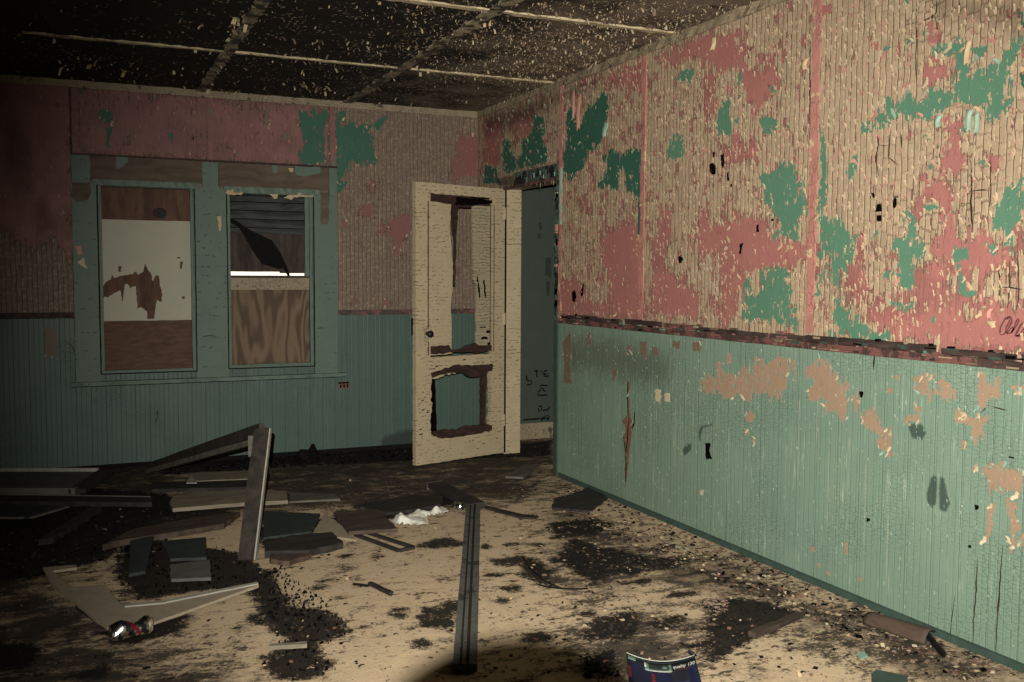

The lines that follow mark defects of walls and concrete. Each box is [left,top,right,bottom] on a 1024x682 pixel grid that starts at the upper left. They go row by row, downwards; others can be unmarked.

peeling [13,1,790,217]
peeling [103,265,162,319]
peeling [557,12,1024,457]
peeling [972,461,1024,553]